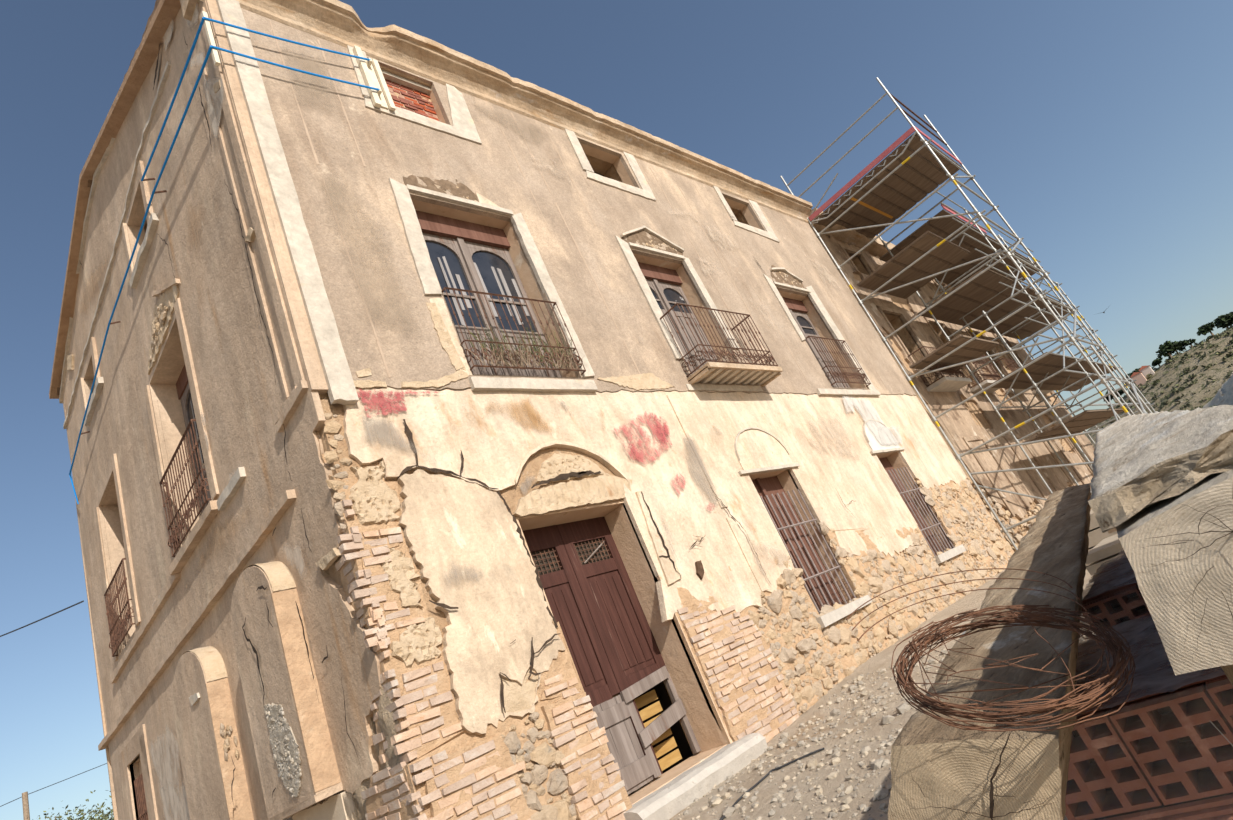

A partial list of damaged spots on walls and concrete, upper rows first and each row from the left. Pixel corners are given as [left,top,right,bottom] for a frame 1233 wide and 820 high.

spalling [315,413,478,763]
crack [390,405,601,628]
spalling [264,703,302,798]